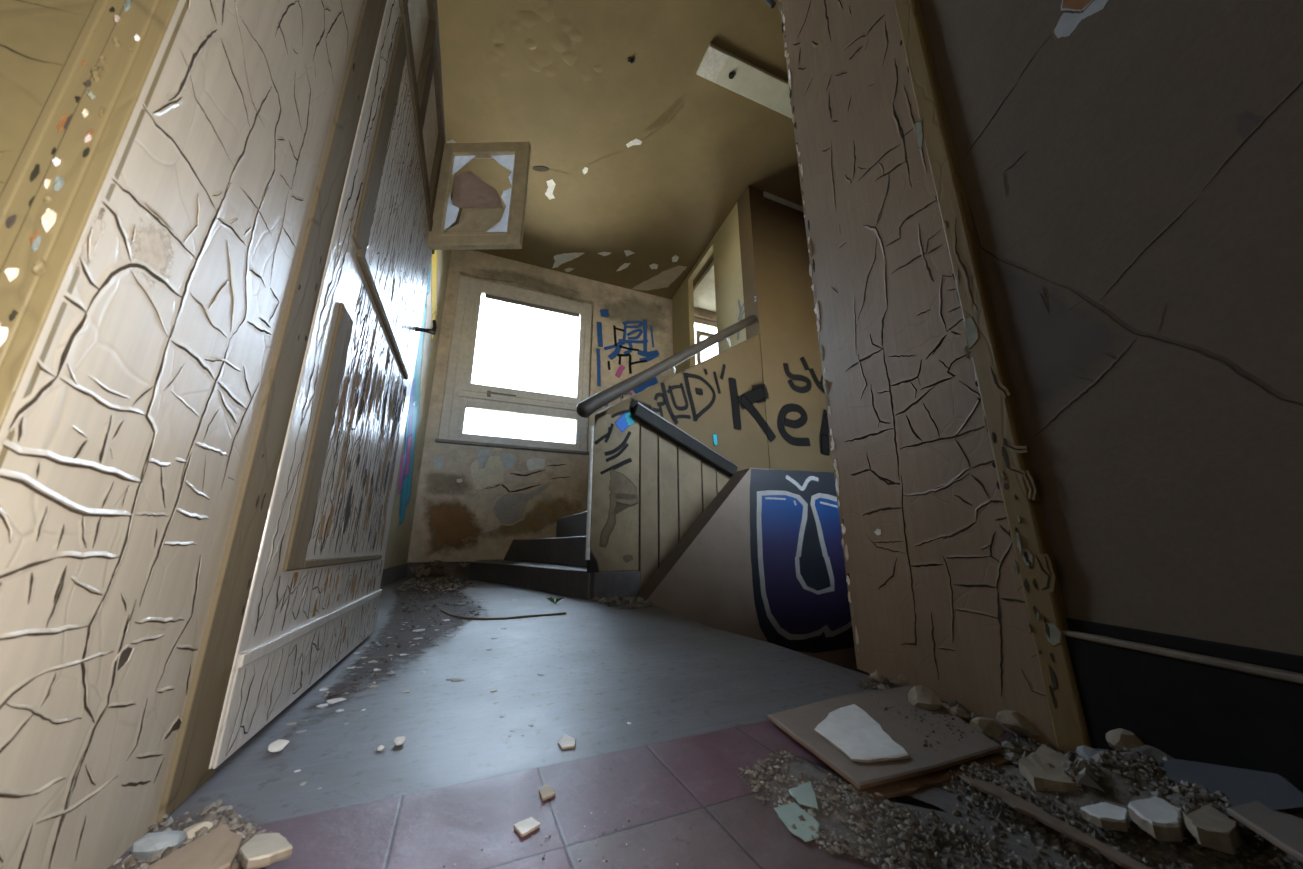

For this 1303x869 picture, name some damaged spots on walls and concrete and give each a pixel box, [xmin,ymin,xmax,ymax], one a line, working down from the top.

flaking render [1061,0,1093,12]
peeling [544,179,556,200]
peeling [552,250,635,272]
flaking render [630,255,688,291]
peeling [779,3,859,651]
crack [793,0,1303,699]
crack [225,0,432,756]
leakage [426,502,480,551]
leakage [499,499,572,535]